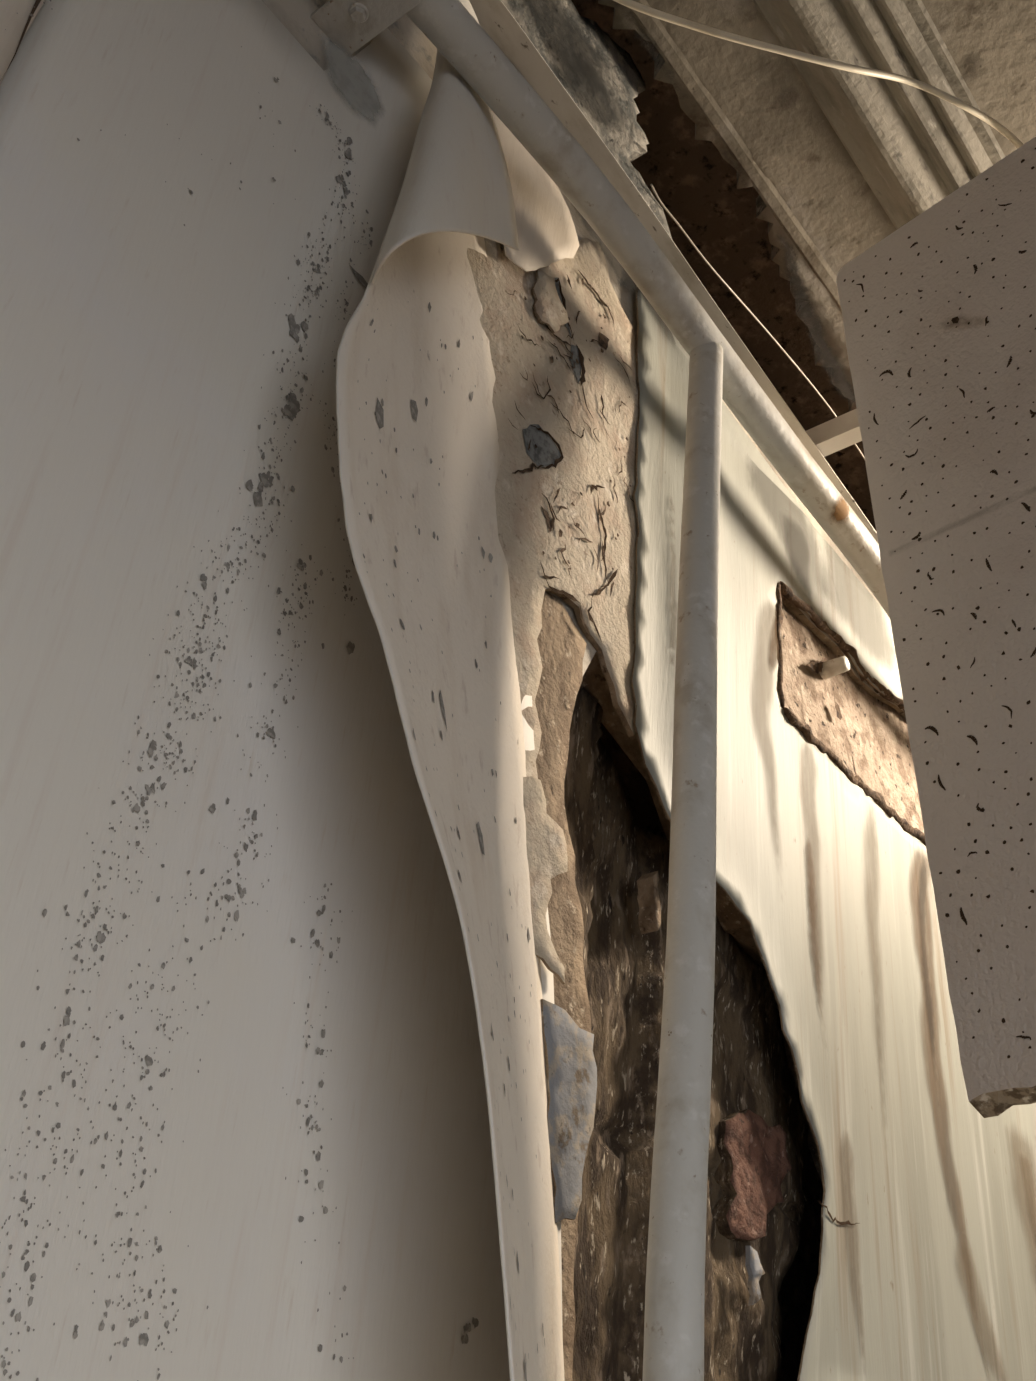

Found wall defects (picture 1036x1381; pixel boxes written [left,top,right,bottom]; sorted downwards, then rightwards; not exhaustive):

crack [3,0,41,76]
damp [359,398,414,453]
damp [411,397,428,422]
crack [508,270,634,642]
damp [1,104,373,1379]
damp [432,690,453,746]
spalling [776,581,926,846]
damp [476,816,496,855]
peeling [467,238,667,1381]
damp [808,858,820,993]
spalling [778,1144,824,1381]